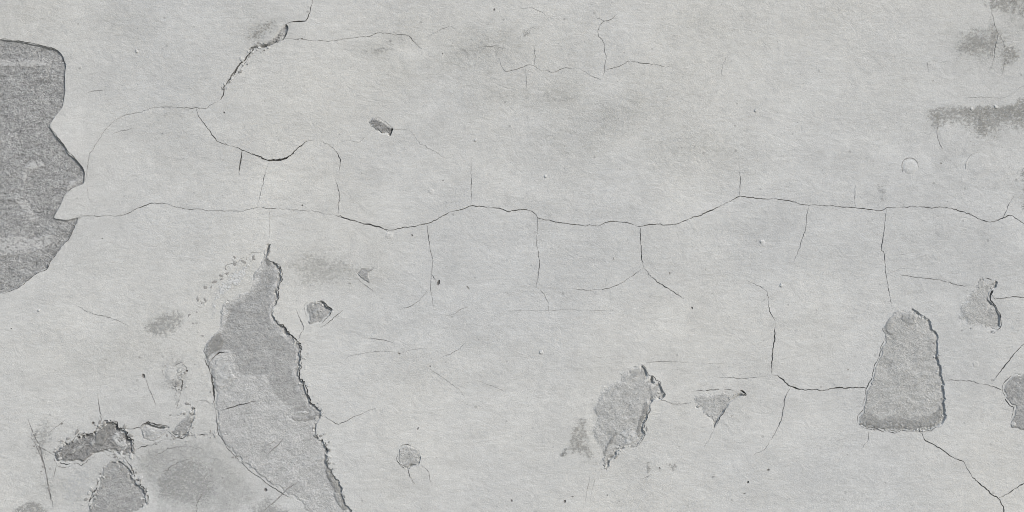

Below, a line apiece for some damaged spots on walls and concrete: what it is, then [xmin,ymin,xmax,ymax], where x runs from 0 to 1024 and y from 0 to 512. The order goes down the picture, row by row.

spalling [0,38,85,294]
spalling [366,115,393,136]
crack [85,1,1024,310]
spalling [30,402,197,512]
crack [81,252,291,512]
peeling [201,244,352,512]
spalling [587,364,666,471]
crack [647,280,865,454]
spalling [857,308,947,434]
crack [922,434,1024,512]
crack [954,344,1024,390]
spalling [1002,372,1024,432]